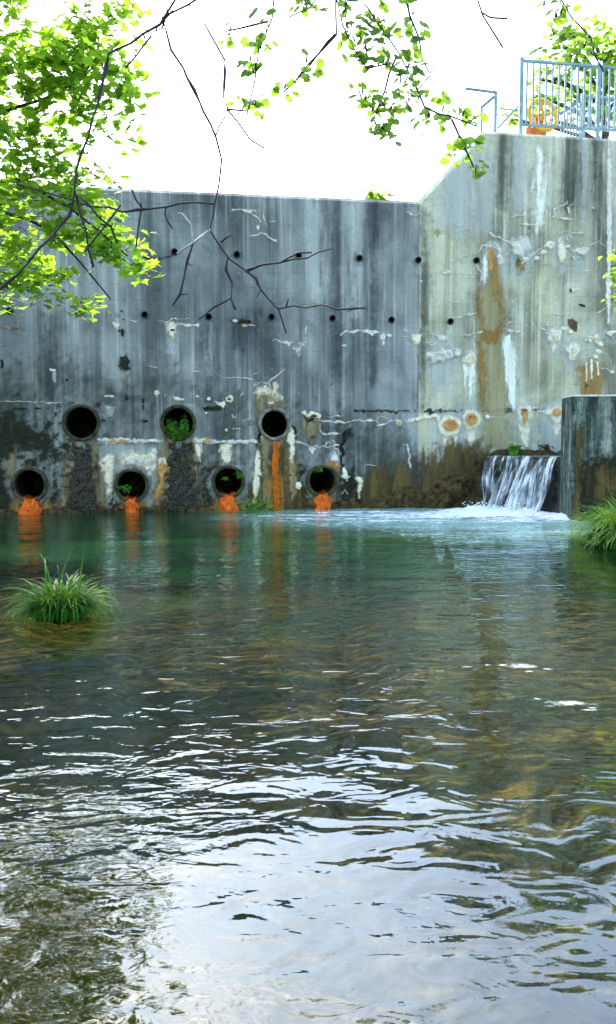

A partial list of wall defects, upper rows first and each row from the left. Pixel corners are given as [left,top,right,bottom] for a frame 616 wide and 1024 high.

corrosion [476,247,509,448]
corrosion [577,358,615,395]
spalling [139,382,283,431]
corrosion [266,441,285,510]
water stain [441,437,482,472]